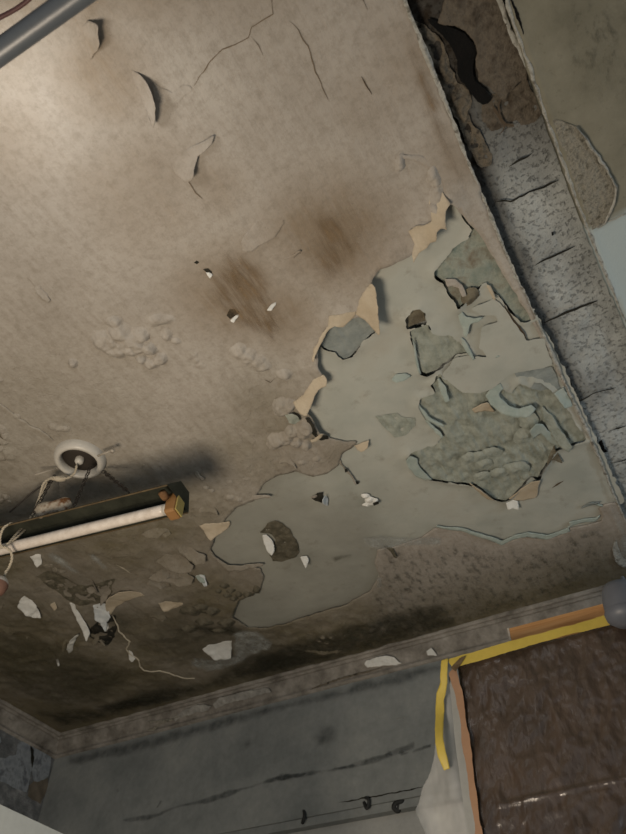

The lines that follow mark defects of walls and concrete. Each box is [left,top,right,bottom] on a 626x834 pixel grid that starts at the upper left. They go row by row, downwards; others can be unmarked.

peeling [132,70,192,127]
crack [194,0,273,86]
crack [292,23,328,99]
spalling [402,0,478,184]
spalling [428,19,492,105]
crack [496,180,558,202]
crack [536,246,575,265]
crack [504,306,527,340]
crack [544,301,596,323]
peeling [200,192,626,628]
spalling [30,554,145,653]
peeling [203,641,232,661]